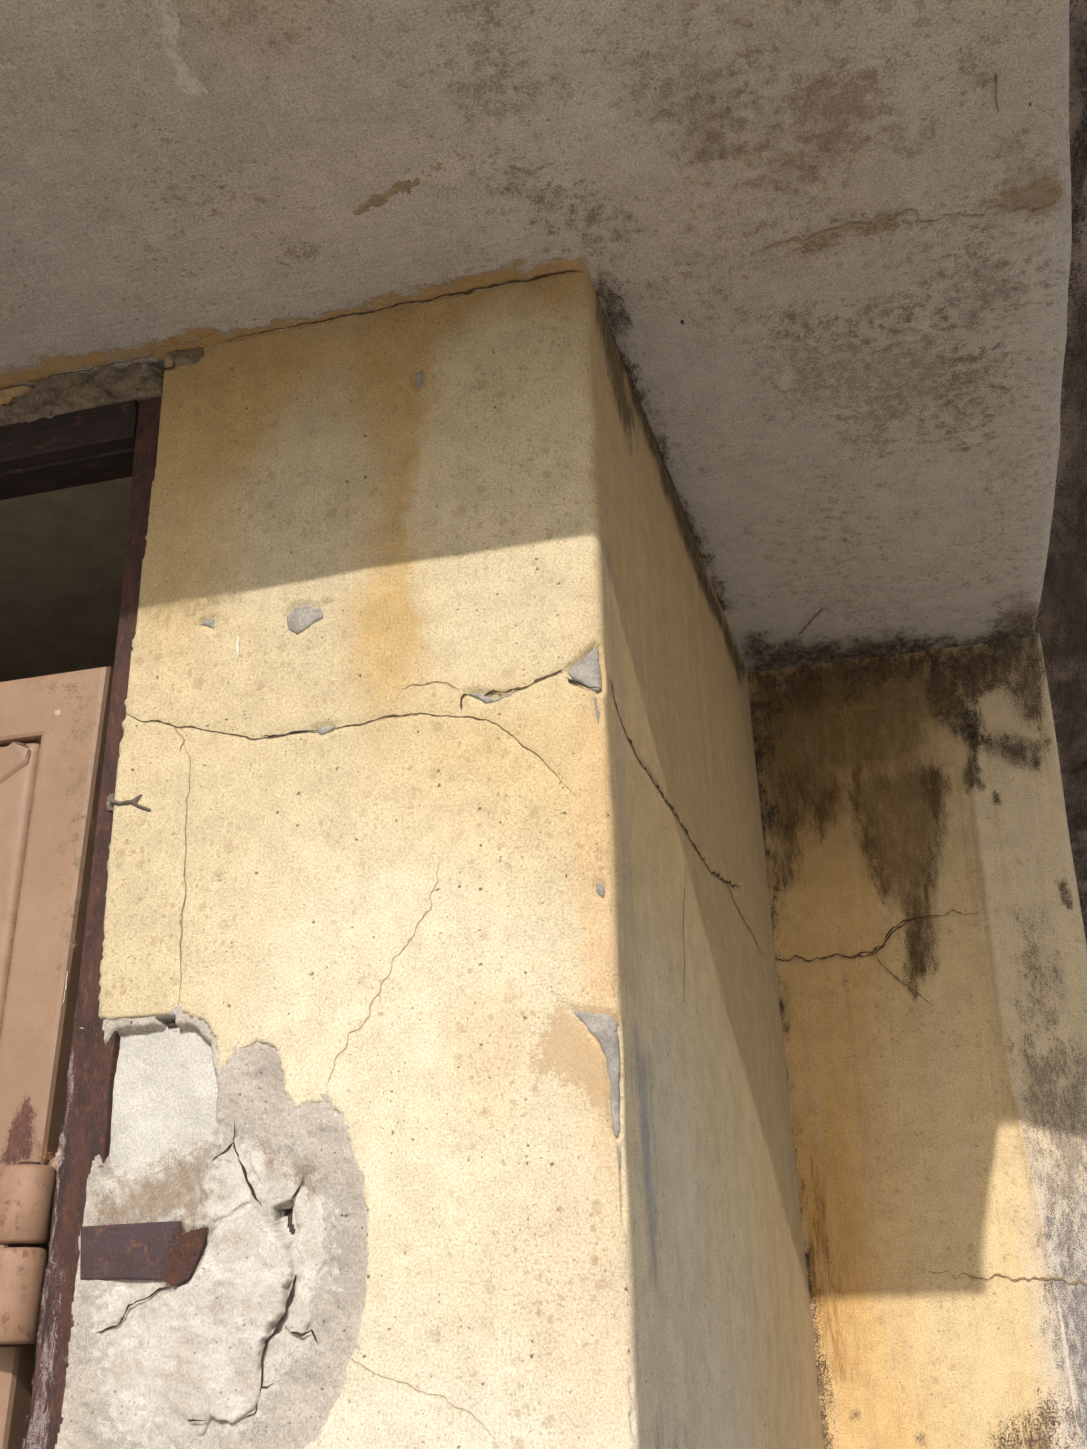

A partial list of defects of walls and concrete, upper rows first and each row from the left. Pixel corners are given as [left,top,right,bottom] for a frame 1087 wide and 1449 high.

spalling [0,362,164,425]
water stain [589,0,1087,1036]
crack [128,669,572,1006]
crack [323,862,440,1098]
crack [610,680,985,1005]
rust [158,1220,208,1292]
spalling [23,1006,369,1449]
water stain [986,907,1087,1449]